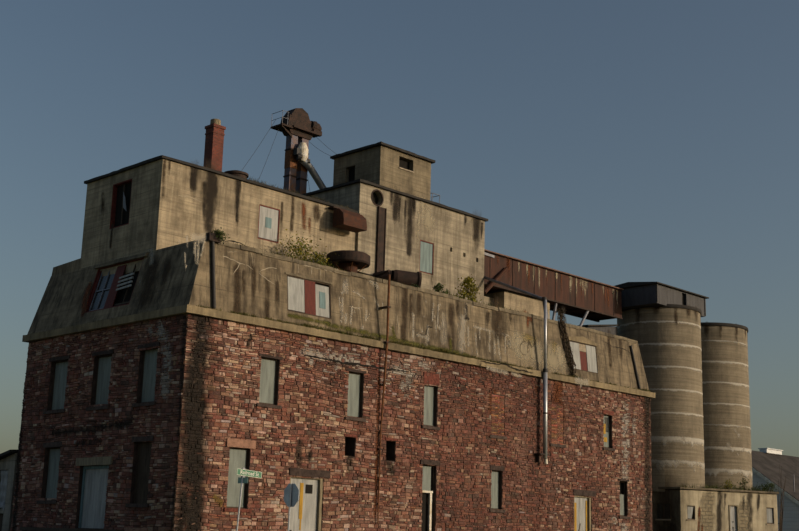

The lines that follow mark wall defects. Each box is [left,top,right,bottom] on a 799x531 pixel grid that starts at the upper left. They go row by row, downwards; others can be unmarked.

water stain [191,166,217,232]
water stain [391,192,433,255]
water stain [389,288,571,375]
water stain [148,314,211,531]